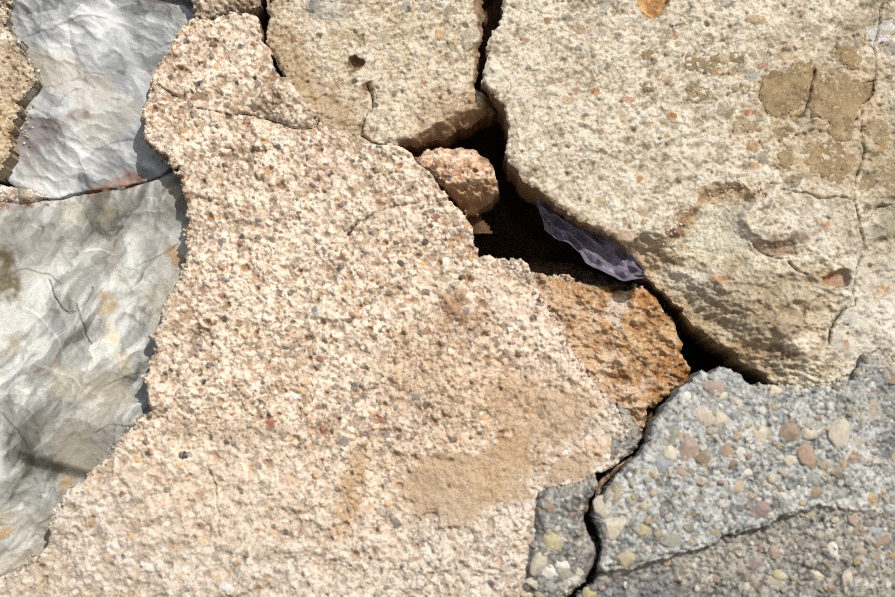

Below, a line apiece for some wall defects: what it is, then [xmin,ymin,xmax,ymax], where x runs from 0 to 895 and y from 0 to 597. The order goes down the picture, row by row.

crack [477,0,503,92]
crack [360,87,387,145]
crack [346,121,637,288]
crack [783,0,893,344]
crack [664,312,723,375]
crack [584,397,667,541]
crack [567,513,790,597]